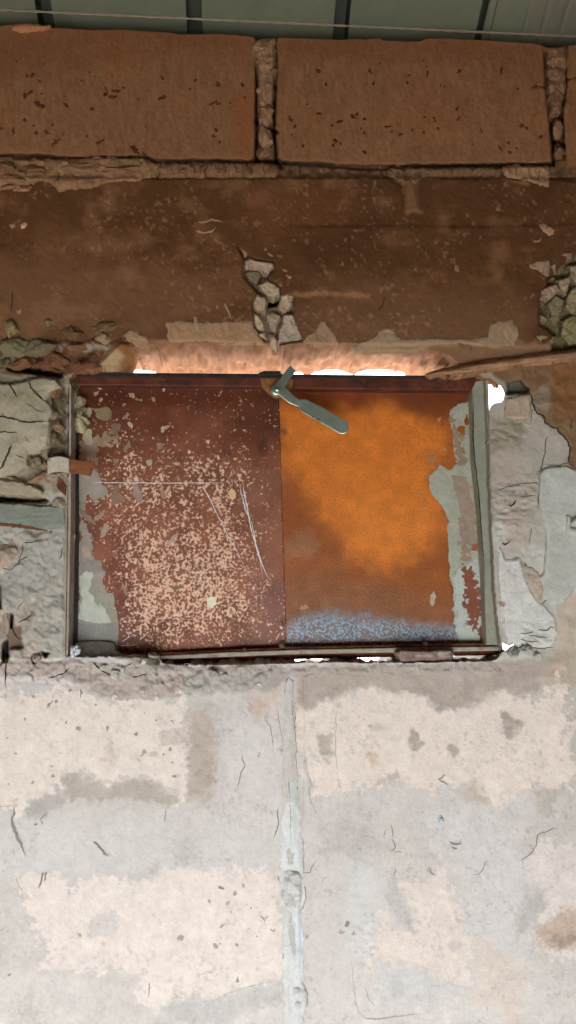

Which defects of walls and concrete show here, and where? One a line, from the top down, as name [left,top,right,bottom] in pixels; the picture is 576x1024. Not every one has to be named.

spalling [239,245,302,353]
spalling [521,253,576,348]
peeling [423,401,482,643]
corrosion [448,414,482,640]
crack [499,388,575,565]
damp [21,701,226,826]